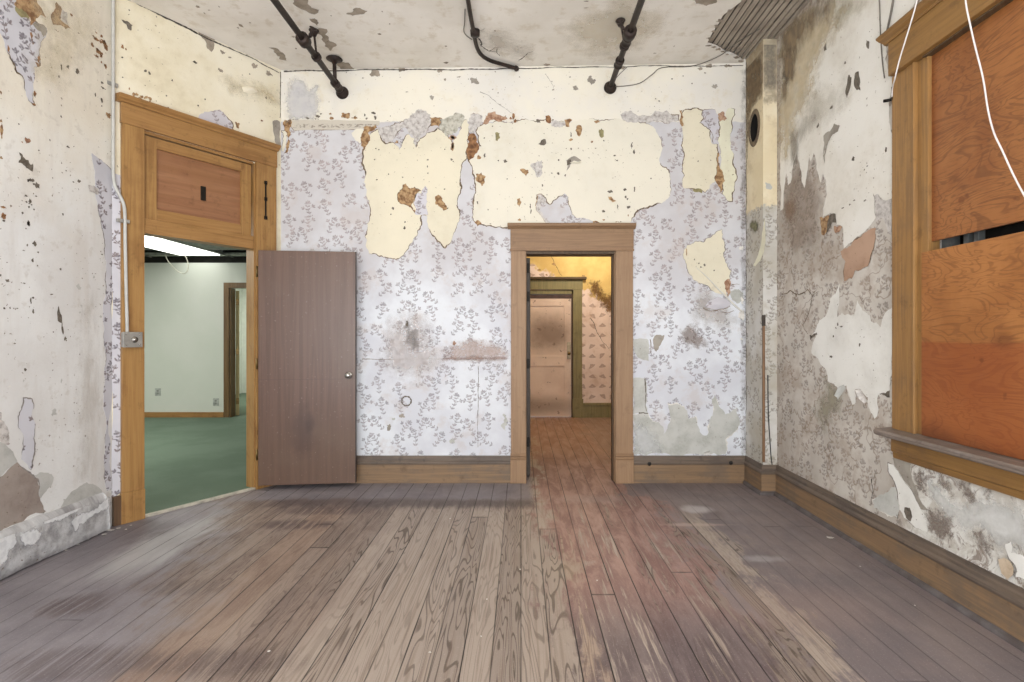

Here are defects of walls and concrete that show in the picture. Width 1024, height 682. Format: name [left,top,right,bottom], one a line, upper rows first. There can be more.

rust [466,132,479,160]
damp [445,342,505,359]
peeling [811,284,892,419]
flaking render [633,378,740,456]
flaking render [0,442,54,531]
flaking render [61,482,102,508]
flaking render [872,458,930,532]
damp [940,481,990,504]
damp [927,510,951,538]
flaking render [998,542,1024,580]